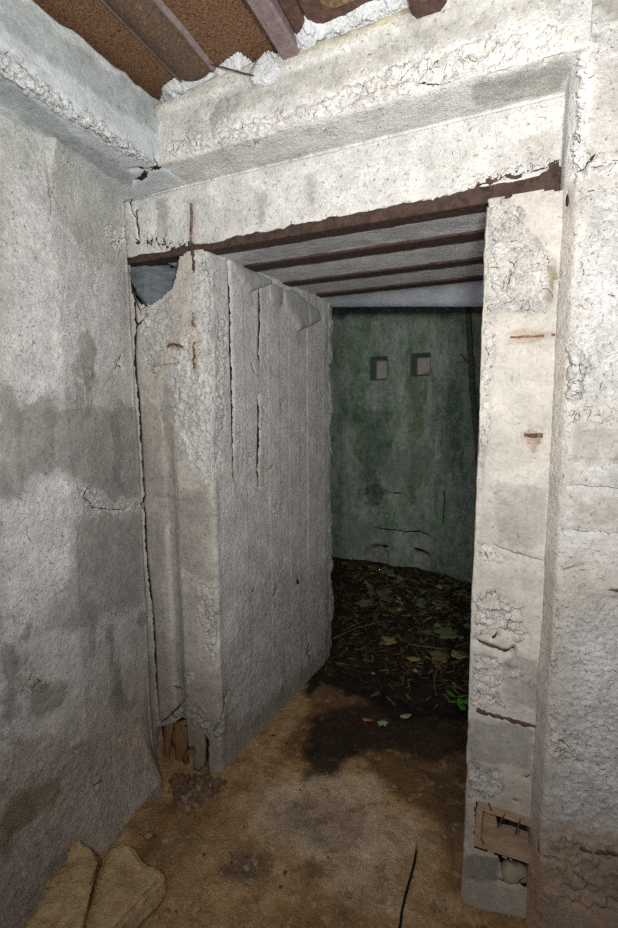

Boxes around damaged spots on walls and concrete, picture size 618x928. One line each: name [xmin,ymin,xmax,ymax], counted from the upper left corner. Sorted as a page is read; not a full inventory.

spalling [0,50,155,165]
crack [113,159,162,246]
rust [167,342,196,369]
crack [205,259,260,476]
damp [0,388,177,535]
crack [83,270,187,722]
crack [256,400,282,488]
rust [476,708,536,728]
rust [580,846,618,857]